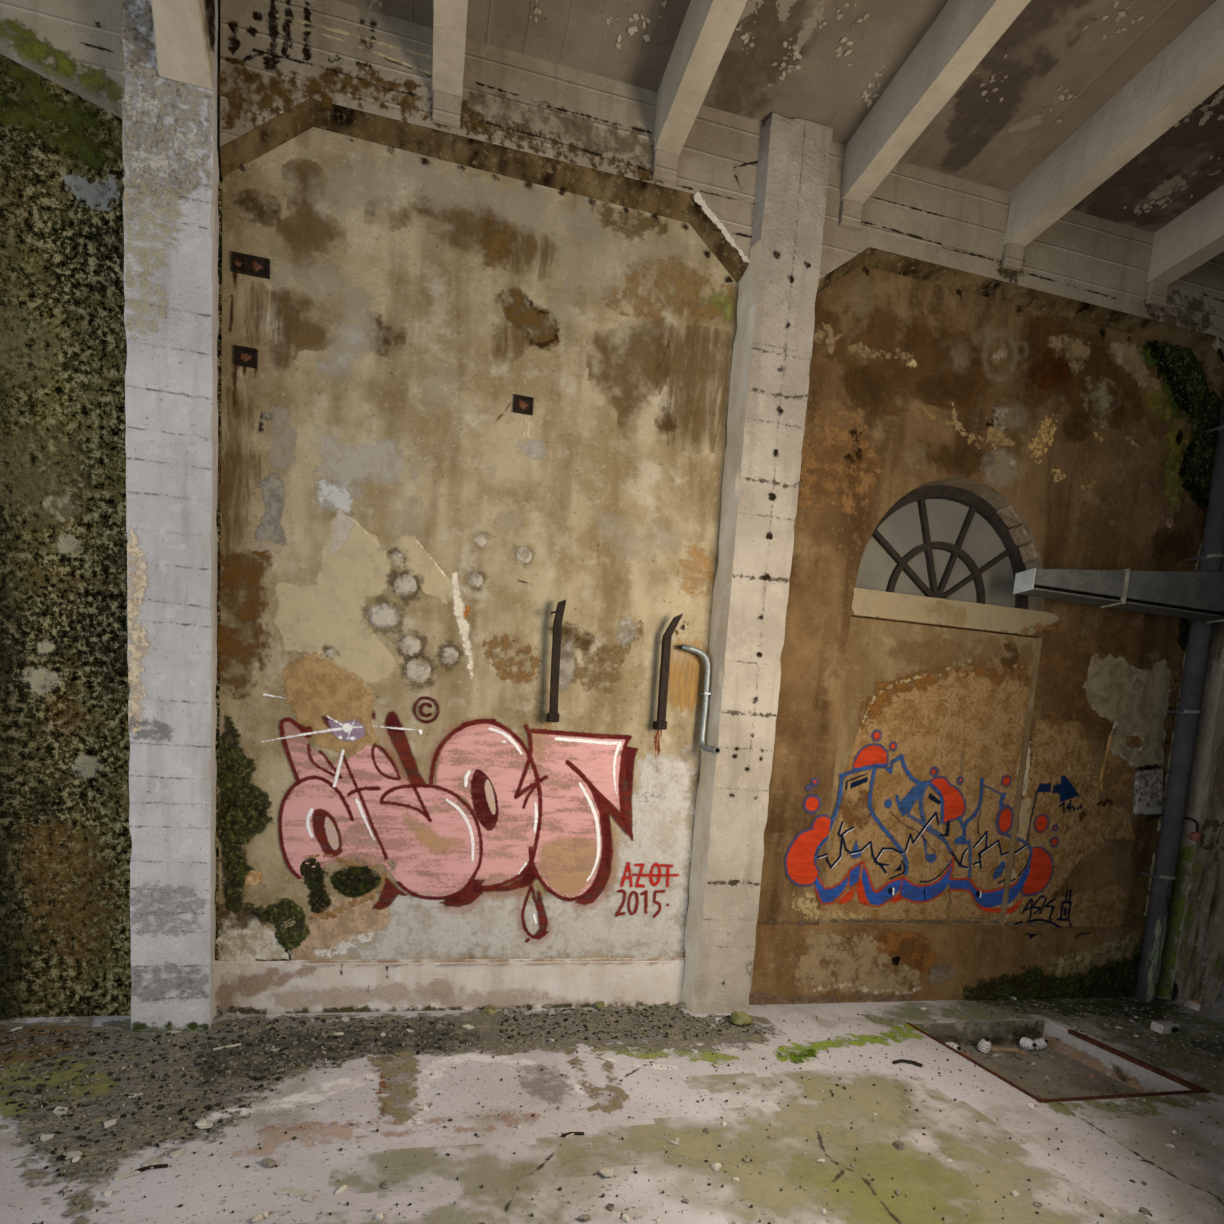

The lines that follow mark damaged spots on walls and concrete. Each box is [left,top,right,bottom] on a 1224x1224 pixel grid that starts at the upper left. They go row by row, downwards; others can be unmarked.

peeling [606,0,667,49]
leakage [718,0,803,113]
leakage [943,0,1087,170]
peeling [63,62,212,341]
leakage [235,161,334,248]
peeling [1124,155,1221,216]
leakage [273,295,326,354]
leakage [497,289,560,351]
flaking render [244,406,296,553]
peeling [273,509,454,757]
leakage [129,715,173,742]
flaking render [791,626,1141,927]